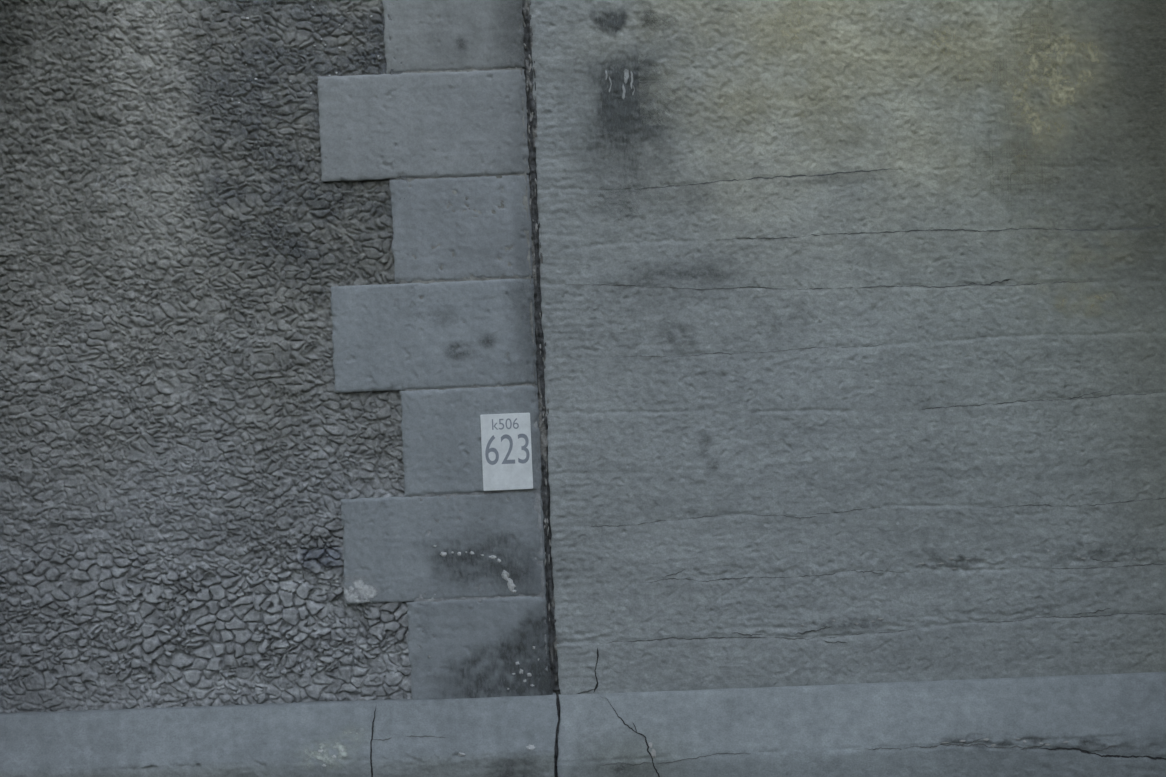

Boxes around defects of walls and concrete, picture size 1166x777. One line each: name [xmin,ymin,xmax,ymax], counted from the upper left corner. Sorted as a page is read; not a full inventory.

leakage [596,12,626,33]
leakage [598,58,661,162]
crack [577,626,924,777]
crack [370,709,445,777]
crack [853,738,1166,760]